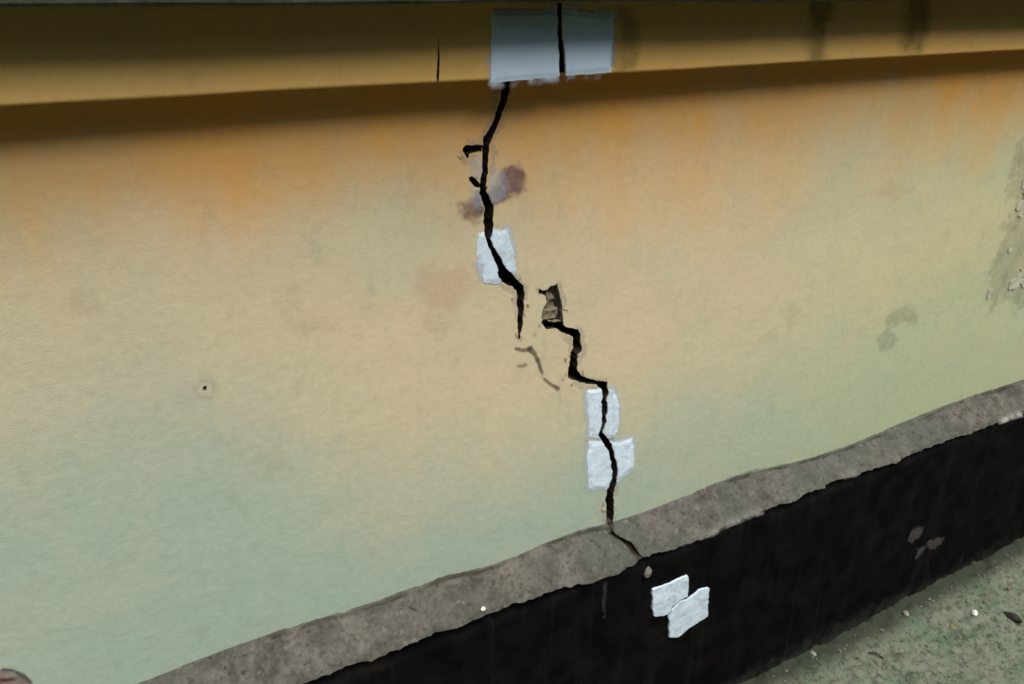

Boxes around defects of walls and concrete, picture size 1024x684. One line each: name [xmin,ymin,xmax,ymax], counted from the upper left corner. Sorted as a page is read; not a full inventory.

crack [557,4,565,73]
damp [477,166,524,212]
crack [458,81,642,560]
spalling [908,526,943,559]